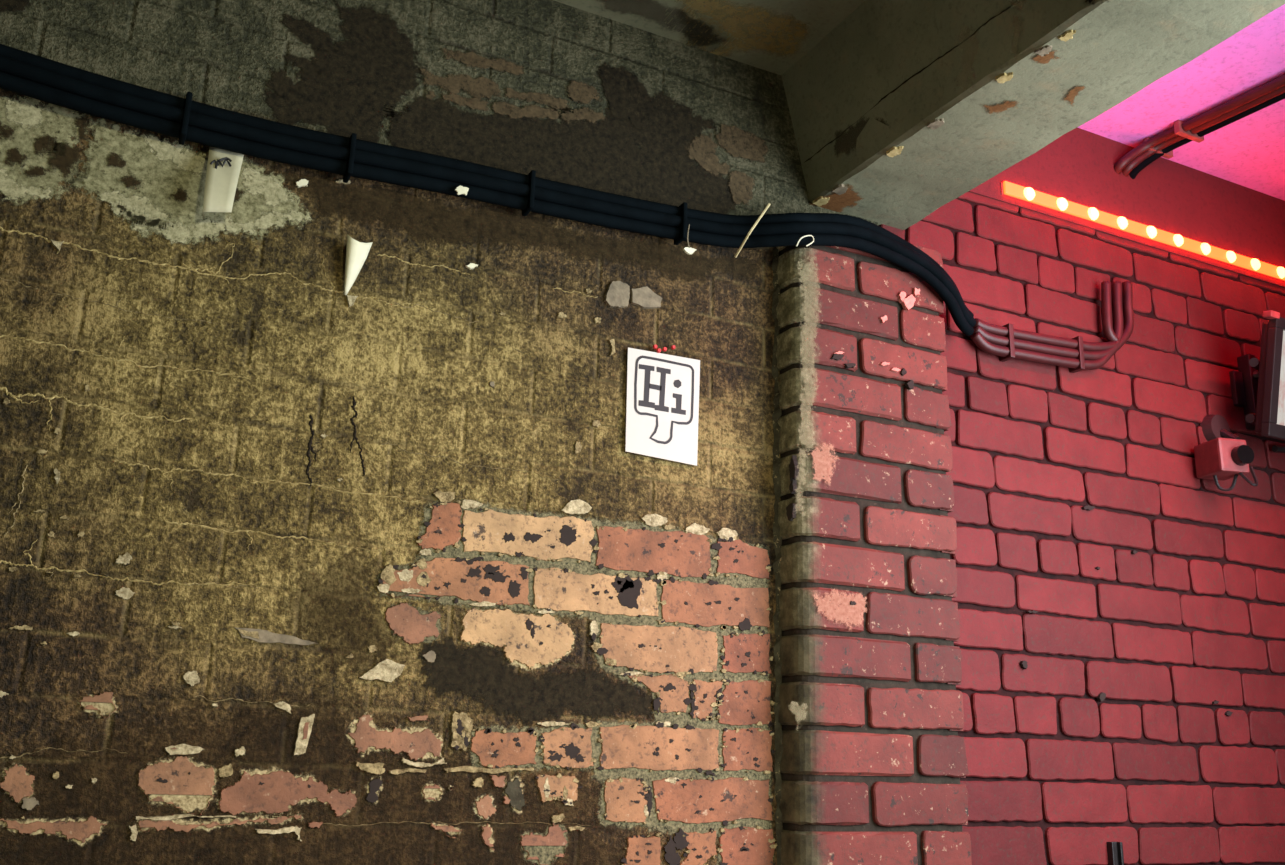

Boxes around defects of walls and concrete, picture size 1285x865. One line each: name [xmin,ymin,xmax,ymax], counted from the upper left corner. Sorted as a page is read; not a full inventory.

damp [599,0,808,56]
damp [263,0,739,214]
peeling [0,94,311,245]
crack [0,387,194,431]
crack [111,396,561,552]
peeling [8,625,47,646]
spalling [78,691,118,719]
peeling [102,553,132,578]
peeling [115,587,135,600]
spalling [129,491,778,865]
damp [418,636,653,726]
spalling [0,755,107,846]